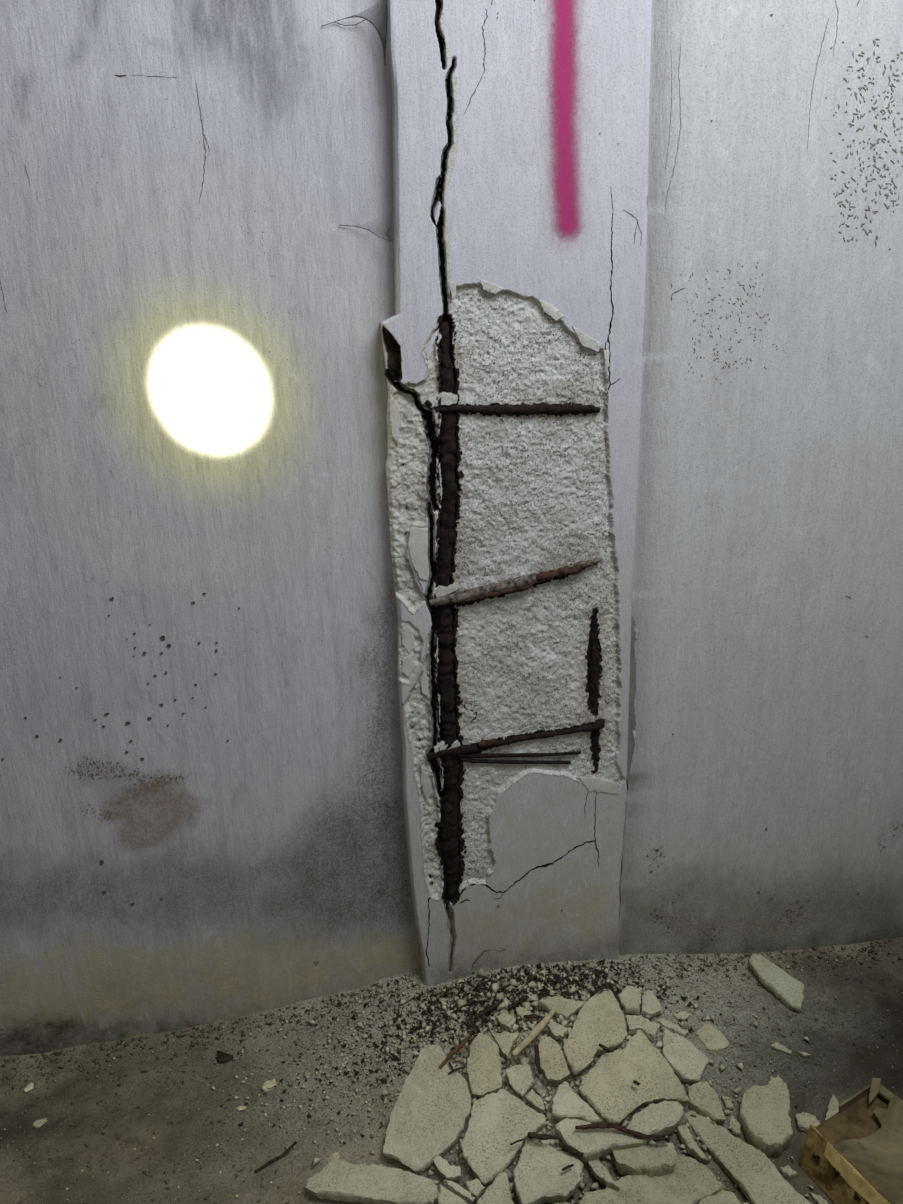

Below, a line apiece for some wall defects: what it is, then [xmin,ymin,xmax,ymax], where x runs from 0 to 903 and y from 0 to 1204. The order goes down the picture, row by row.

crack [431,0,493,319]
crack [665,45,681,206]
crack [604,194,642,421]
spalling [382,280,638,901]
rust [465,563,588,602]
rust [478,738,496,748]
crack [426,780,628,971]